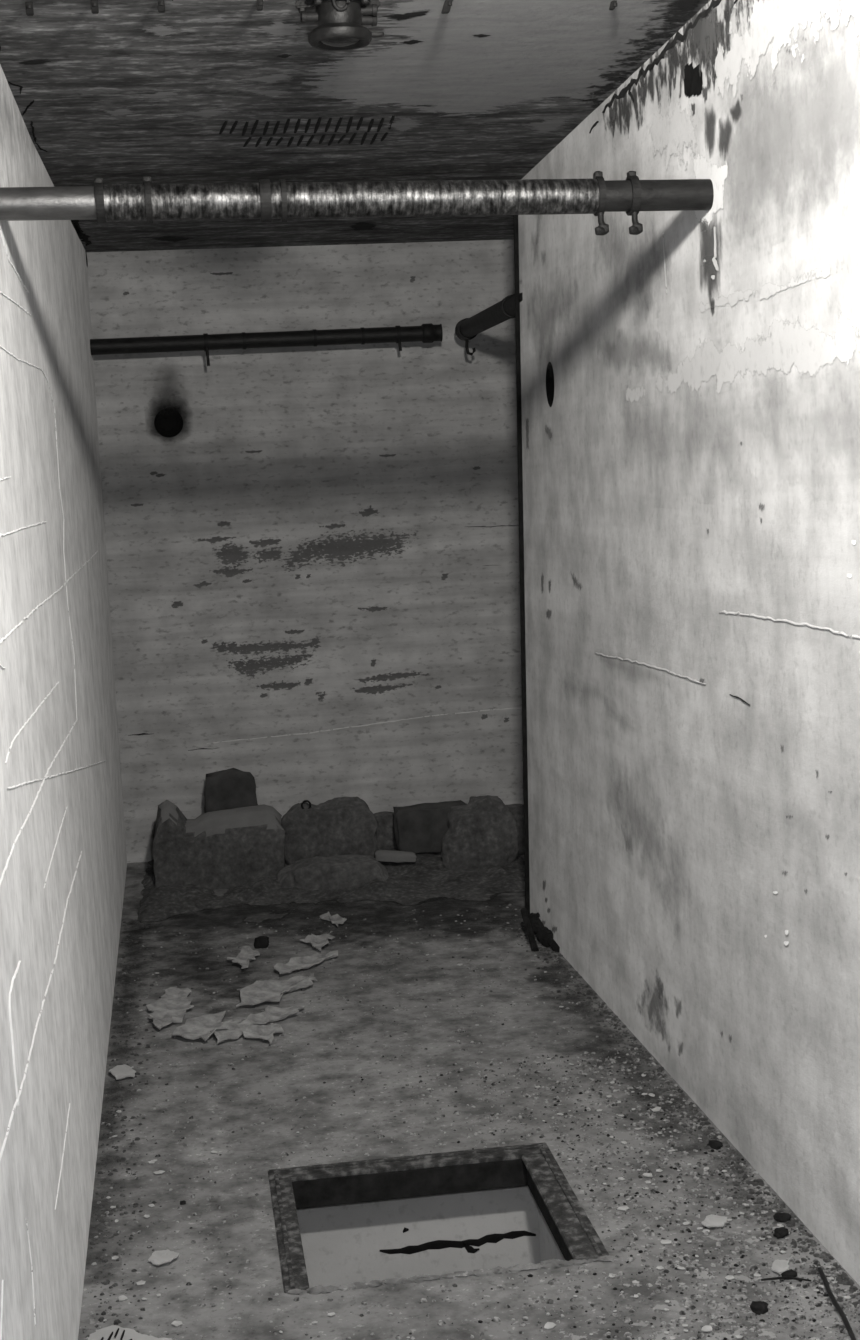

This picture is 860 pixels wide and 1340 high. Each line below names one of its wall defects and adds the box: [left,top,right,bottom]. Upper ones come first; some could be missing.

water stain [640,979,682,1053]